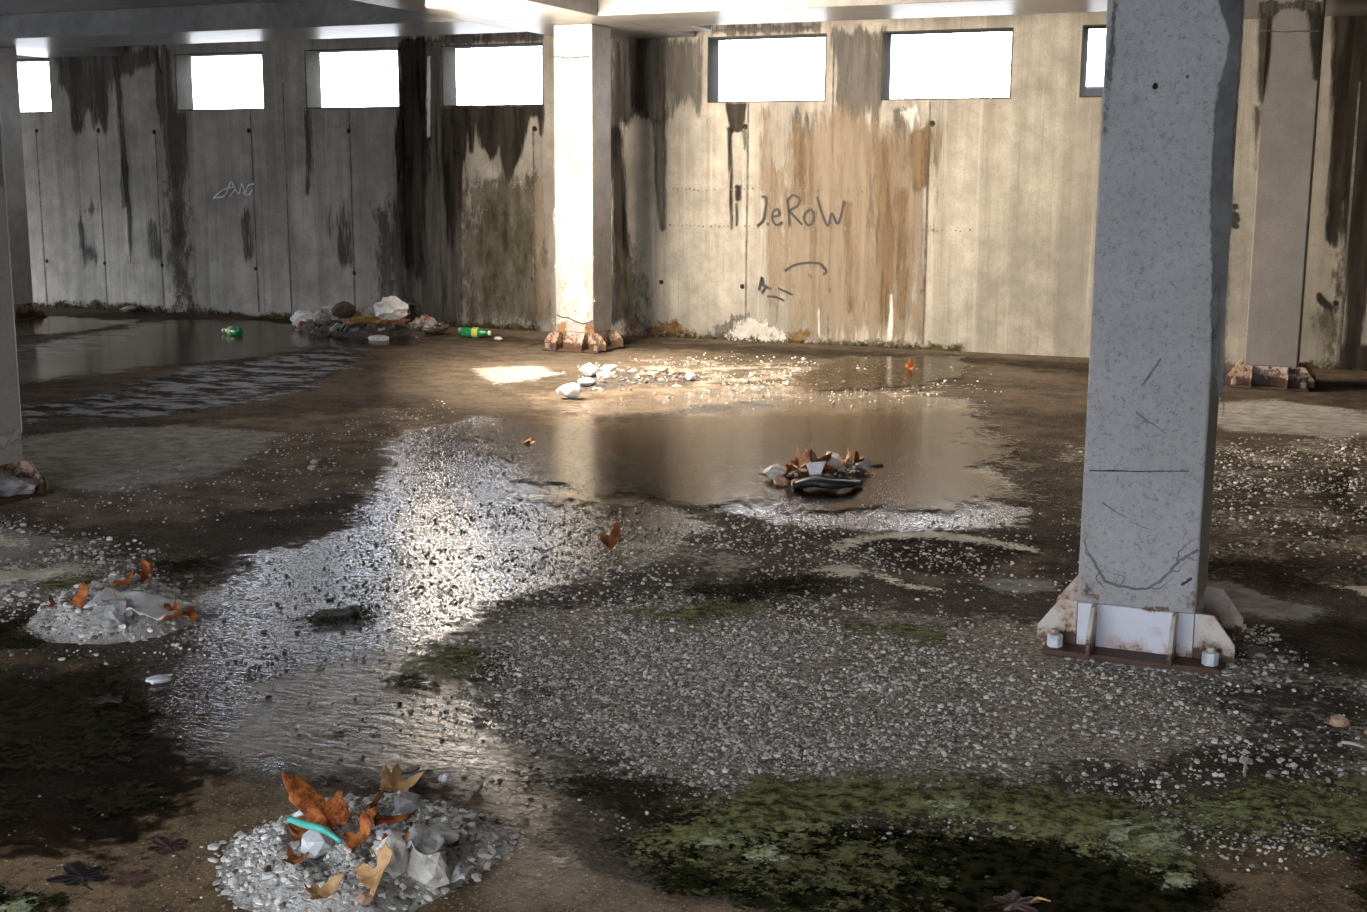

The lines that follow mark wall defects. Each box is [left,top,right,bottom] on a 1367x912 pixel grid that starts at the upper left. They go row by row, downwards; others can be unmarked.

leakage [39,44,292,319]
leakage [304,108,314,195]
leakage [329,209,352,266]
leakage [373,32,550,346]
corrosion [622,315,695,337]
corrosion [760,103,939,343]
leakage [611,22,1089,376]
leakage [1210,0,1367,413]
crack [1084,535,1199,590]